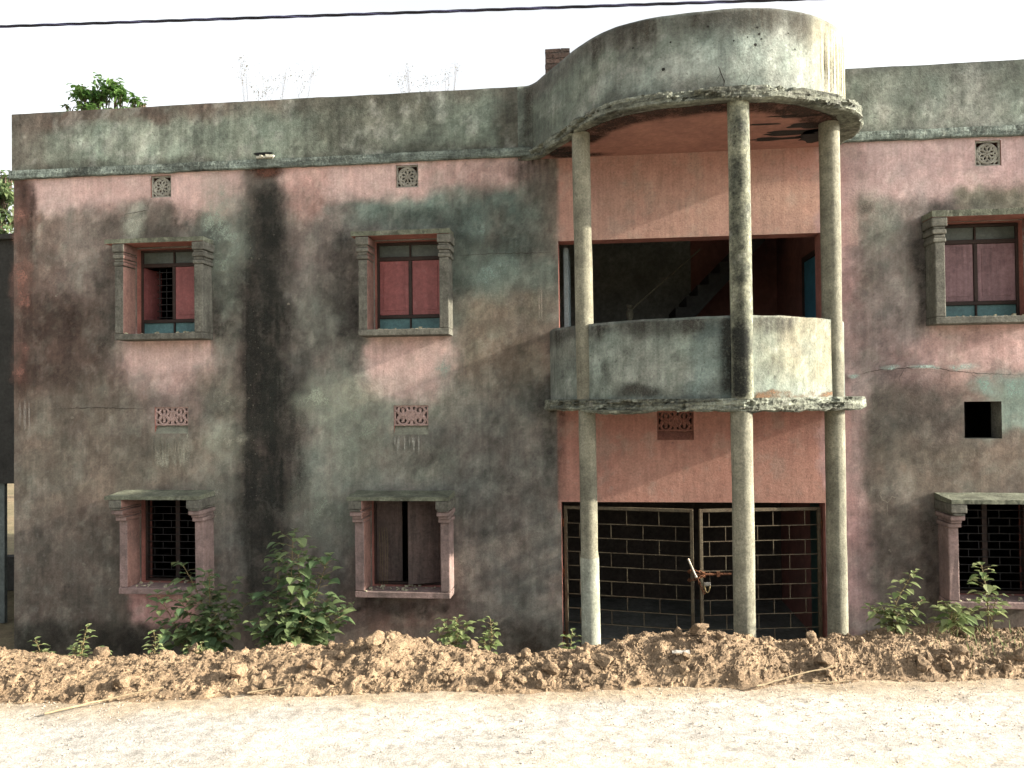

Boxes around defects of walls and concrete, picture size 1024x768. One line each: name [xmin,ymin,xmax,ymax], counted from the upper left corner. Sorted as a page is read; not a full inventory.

peeling [751,94,831,143]
crack [858,367,1013,385]
leakage [125,184,333,644]